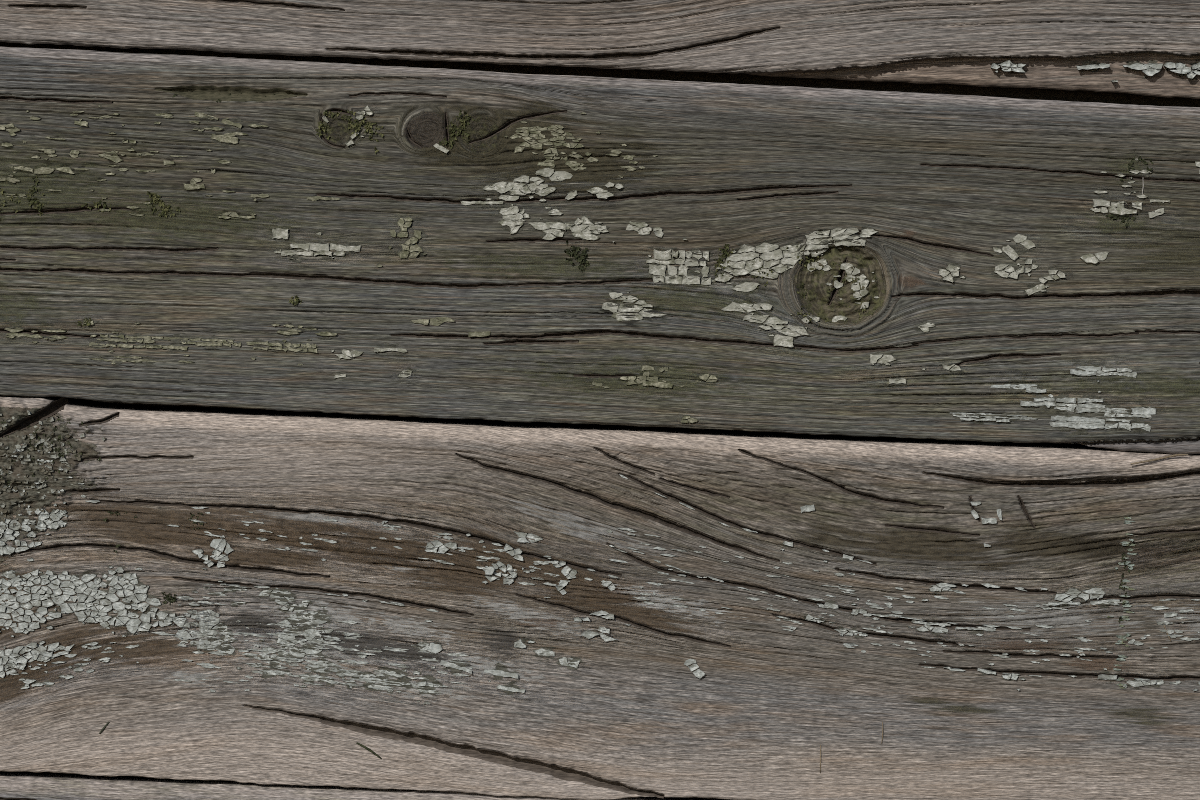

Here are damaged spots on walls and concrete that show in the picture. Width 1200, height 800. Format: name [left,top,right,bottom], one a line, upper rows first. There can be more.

spalling [730,51,1200,99]
peeling [461,121,658,242]
peeling [1090,158,1170,218]
peeling [602,291,671,322]
peeling [626,221,879,353]
peeling [938,263,967,283]
peeling [991,232,1067,296]
crack [0,397,119,438]
peeling [0,450,751,704]
crack [0,447,1200,681]
peeling [738,517,1200,691]
crack [244,704,664,798]